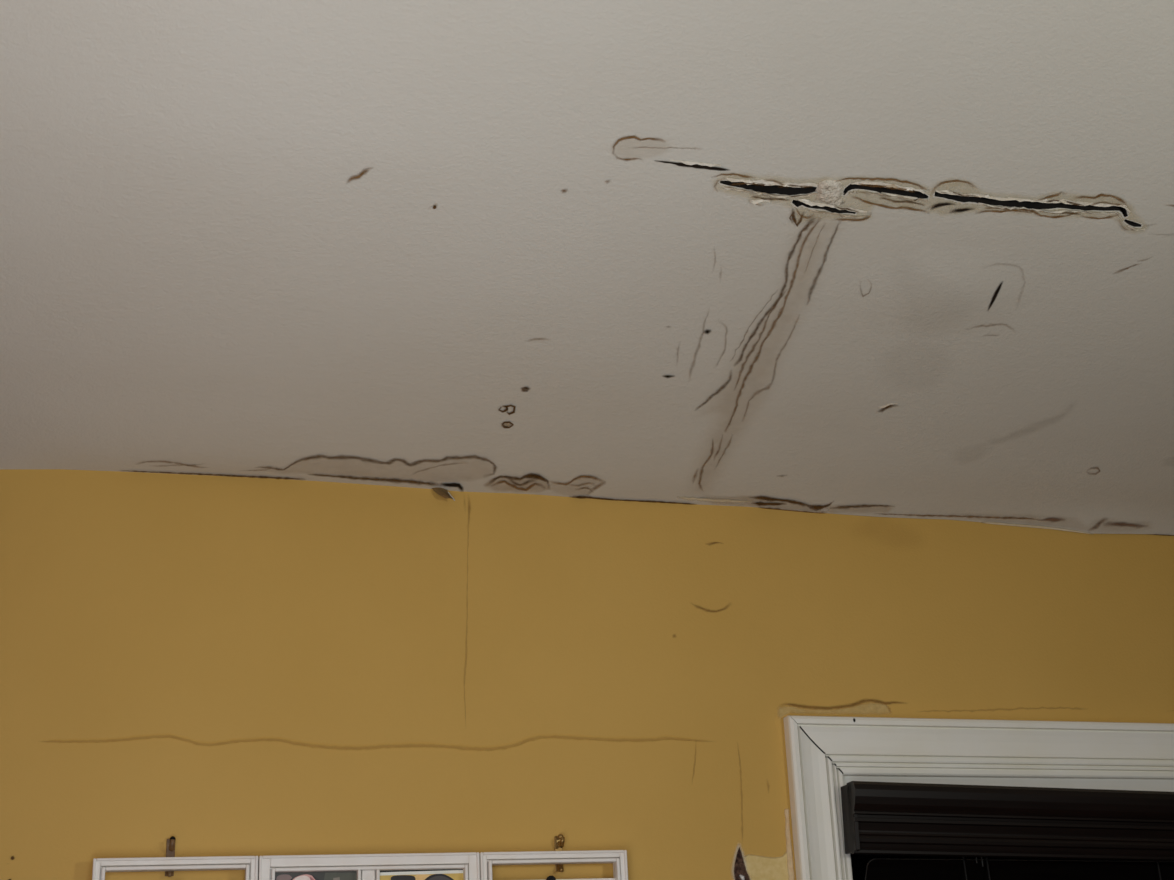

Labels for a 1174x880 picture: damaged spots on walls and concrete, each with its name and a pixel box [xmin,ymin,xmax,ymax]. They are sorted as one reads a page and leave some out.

water stain [810,178,923,294]
crack [658,160,1145,231]
water stain [982,194,1125,219]
water stain [699,173,816,425]
spalling [733,846,750,880]